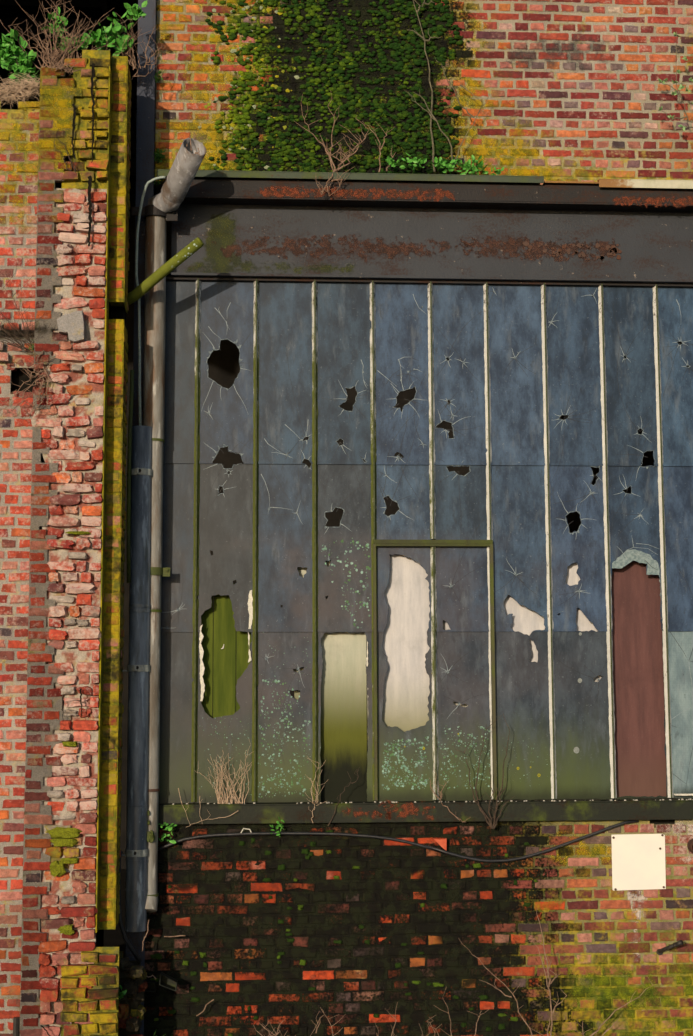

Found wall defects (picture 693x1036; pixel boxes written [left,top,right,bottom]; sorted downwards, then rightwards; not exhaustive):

rust [612,196,693,207]
rust [212,234,616,262]
spalling [5,188,107,1036]
rust [345,801,435,820]
water stain [627,891,647,954]